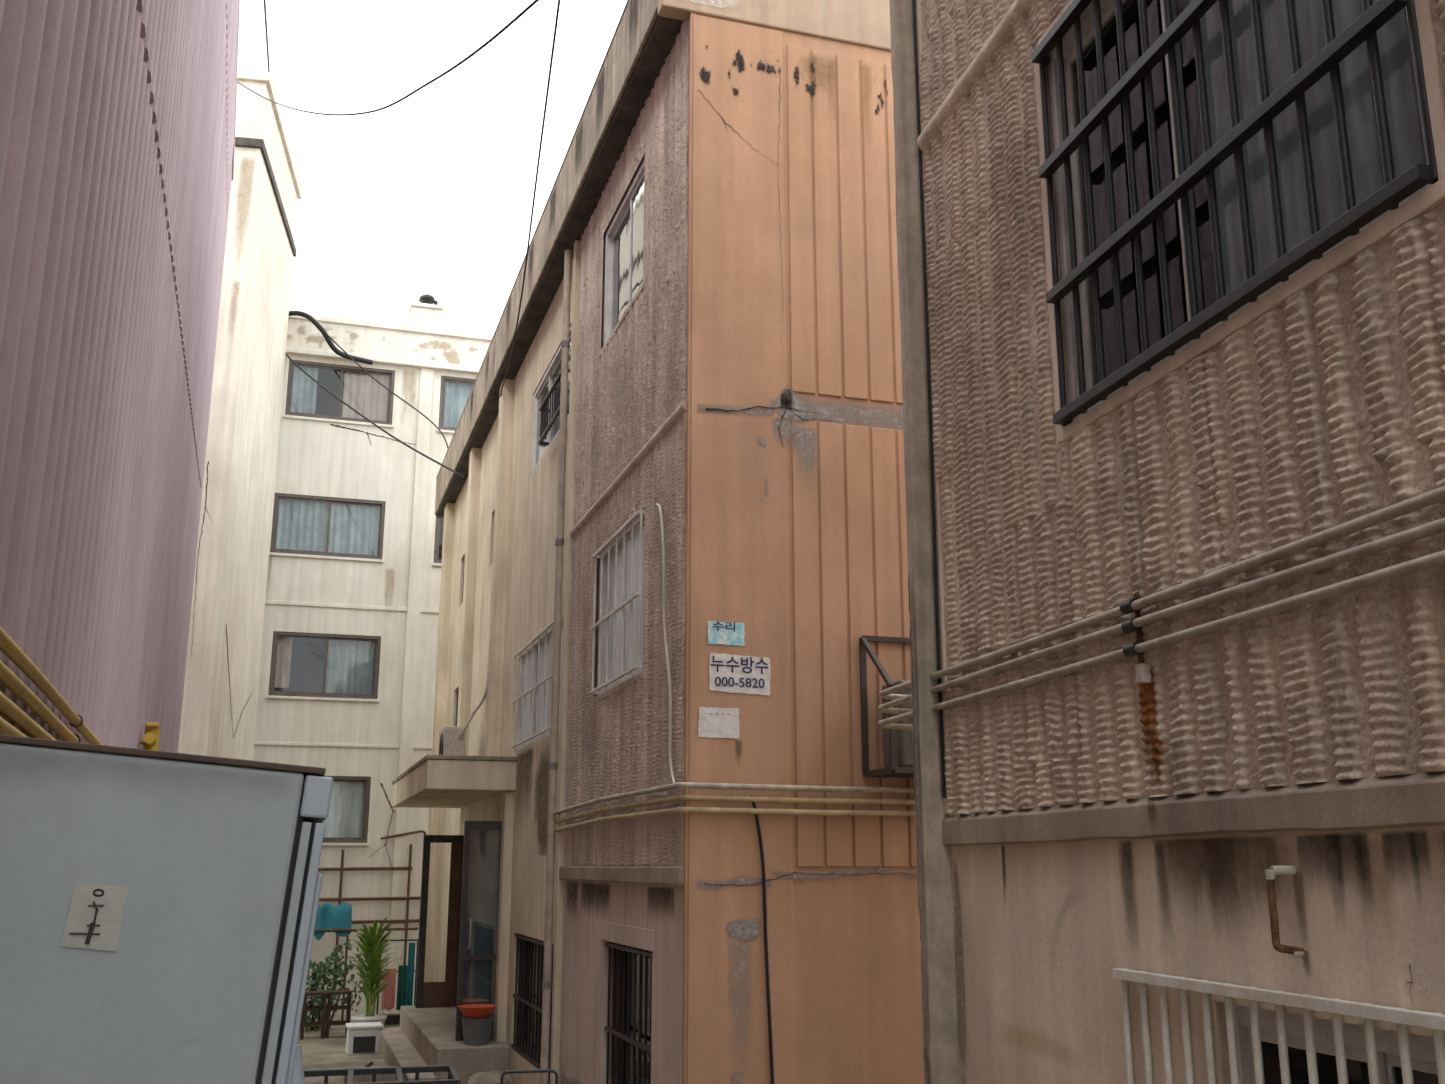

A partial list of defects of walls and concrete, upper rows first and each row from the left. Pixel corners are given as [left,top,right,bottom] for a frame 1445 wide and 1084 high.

corrosion [1138,667,1164,776]
water stain [1122,842,1131,901]
water stain [1156,838,1272,906]
water stain [1298,835,1367,884]
water stain [1383,833,1427,865]
peeling [727,919,760,941]